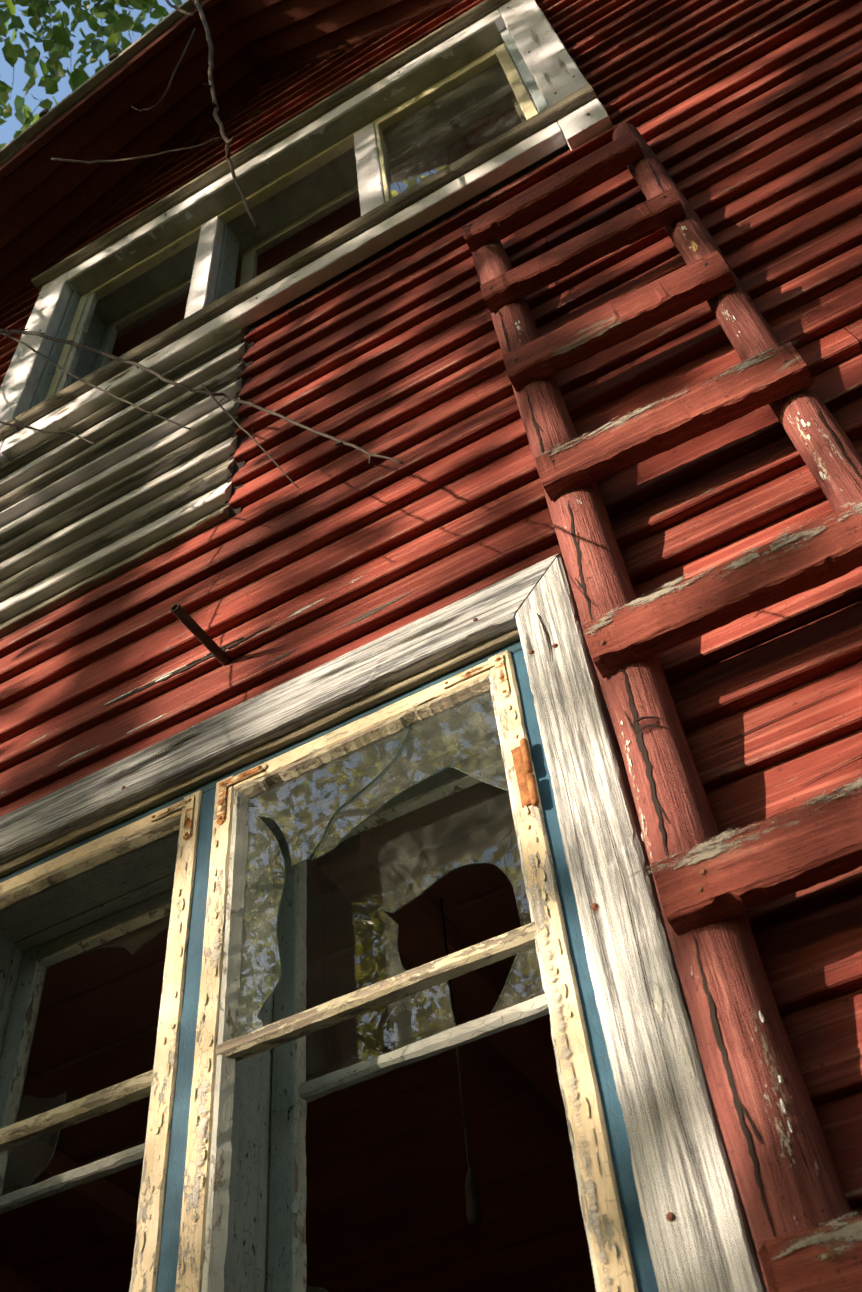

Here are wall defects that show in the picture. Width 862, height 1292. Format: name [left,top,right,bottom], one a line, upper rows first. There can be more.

peeling [211,911,221,976]
peeling [193,1038,212,1226]
peeling [518,788,618,1292]
crack [693,935,775,1237]
peeling [747,1009,800,1167]